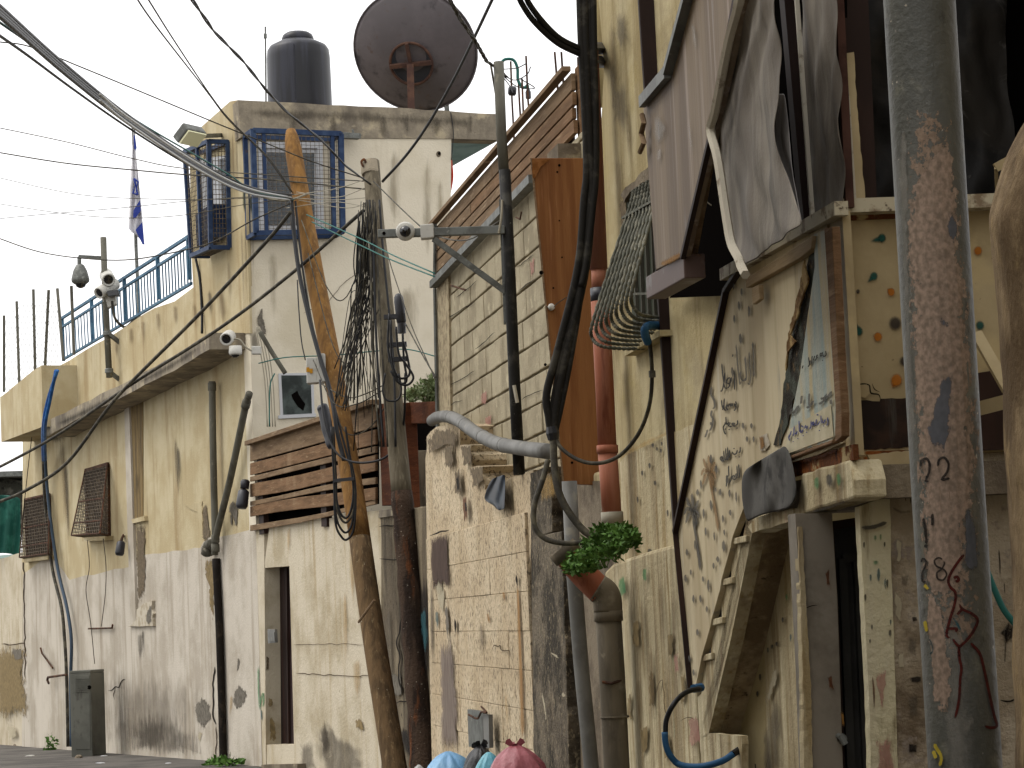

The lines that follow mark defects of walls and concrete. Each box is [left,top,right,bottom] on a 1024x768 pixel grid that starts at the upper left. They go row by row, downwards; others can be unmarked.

spalling [128,525,156,627]
peeling [0,643,27,738]
peeling [195,697,211,741]
peeling [233,685,247,709]
crack [297,671,368,679]